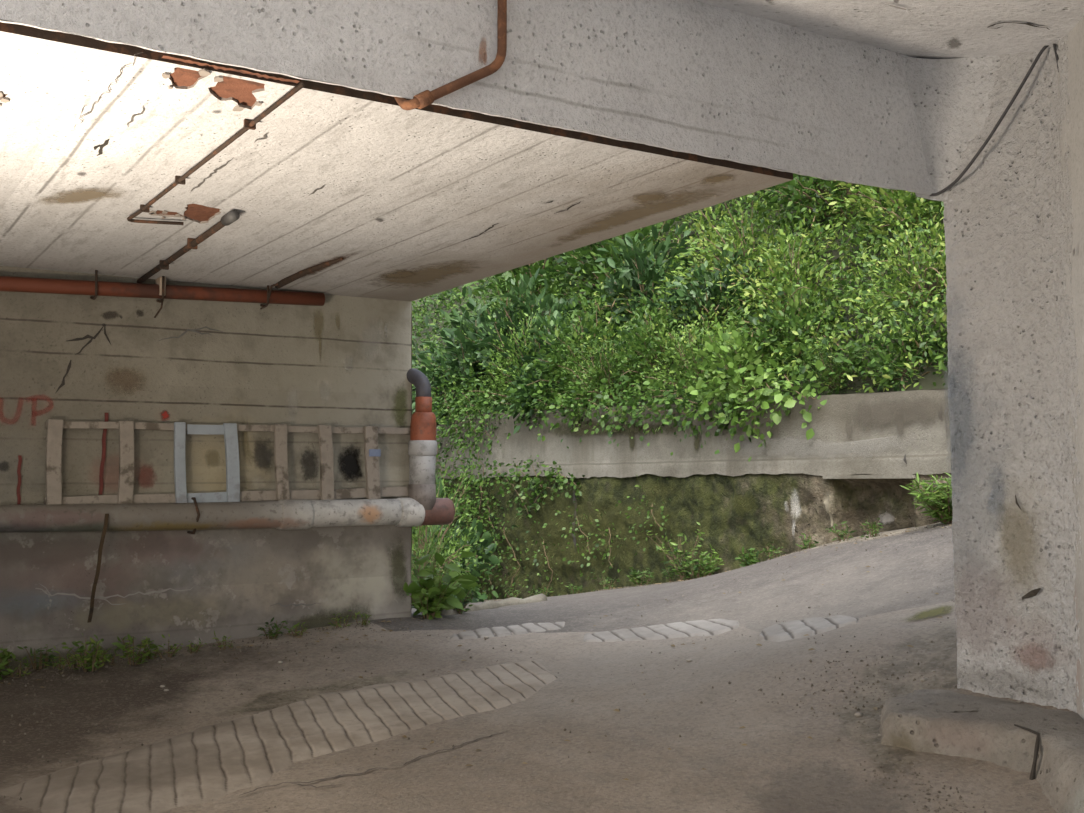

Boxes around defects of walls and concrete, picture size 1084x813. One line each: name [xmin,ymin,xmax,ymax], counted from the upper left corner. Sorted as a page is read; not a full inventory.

crack [74,52,143,129]
spalling [162,56,299,113]
crack [93,107,145,156]
water stain [45,190,113,203]
spalling [149,204,222,224]
water stain [381,262,467,286]
crack [55,324,111,394]
water stain [255,444,273,468]
water stain [303,451,317,479]
water stain [339,446,362,481]
crack [35,584,198,605]